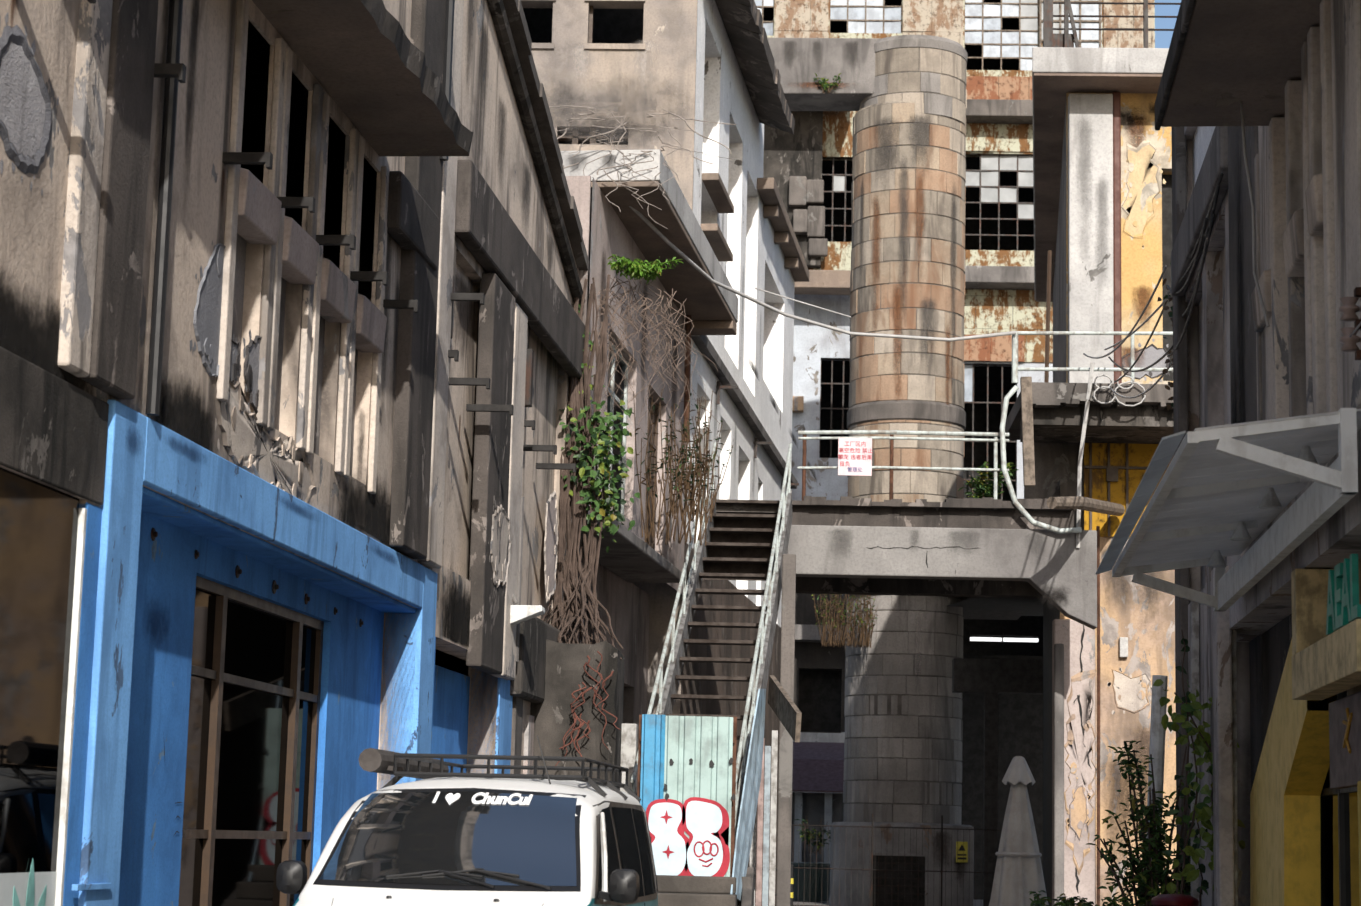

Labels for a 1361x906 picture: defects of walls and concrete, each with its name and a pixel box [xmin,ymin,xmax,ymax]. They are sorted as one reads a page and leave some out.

flaking render [0,13,59,195]
flaking render [1121,135,1166,249]
water stain [0,276,85,389]
flaking render [190,240,324,503]
crack [866,546,977,568]
crack [1074,625,1091,768]
flaking render [1064,649,1152,875]
crack [1073,833,1081,892]